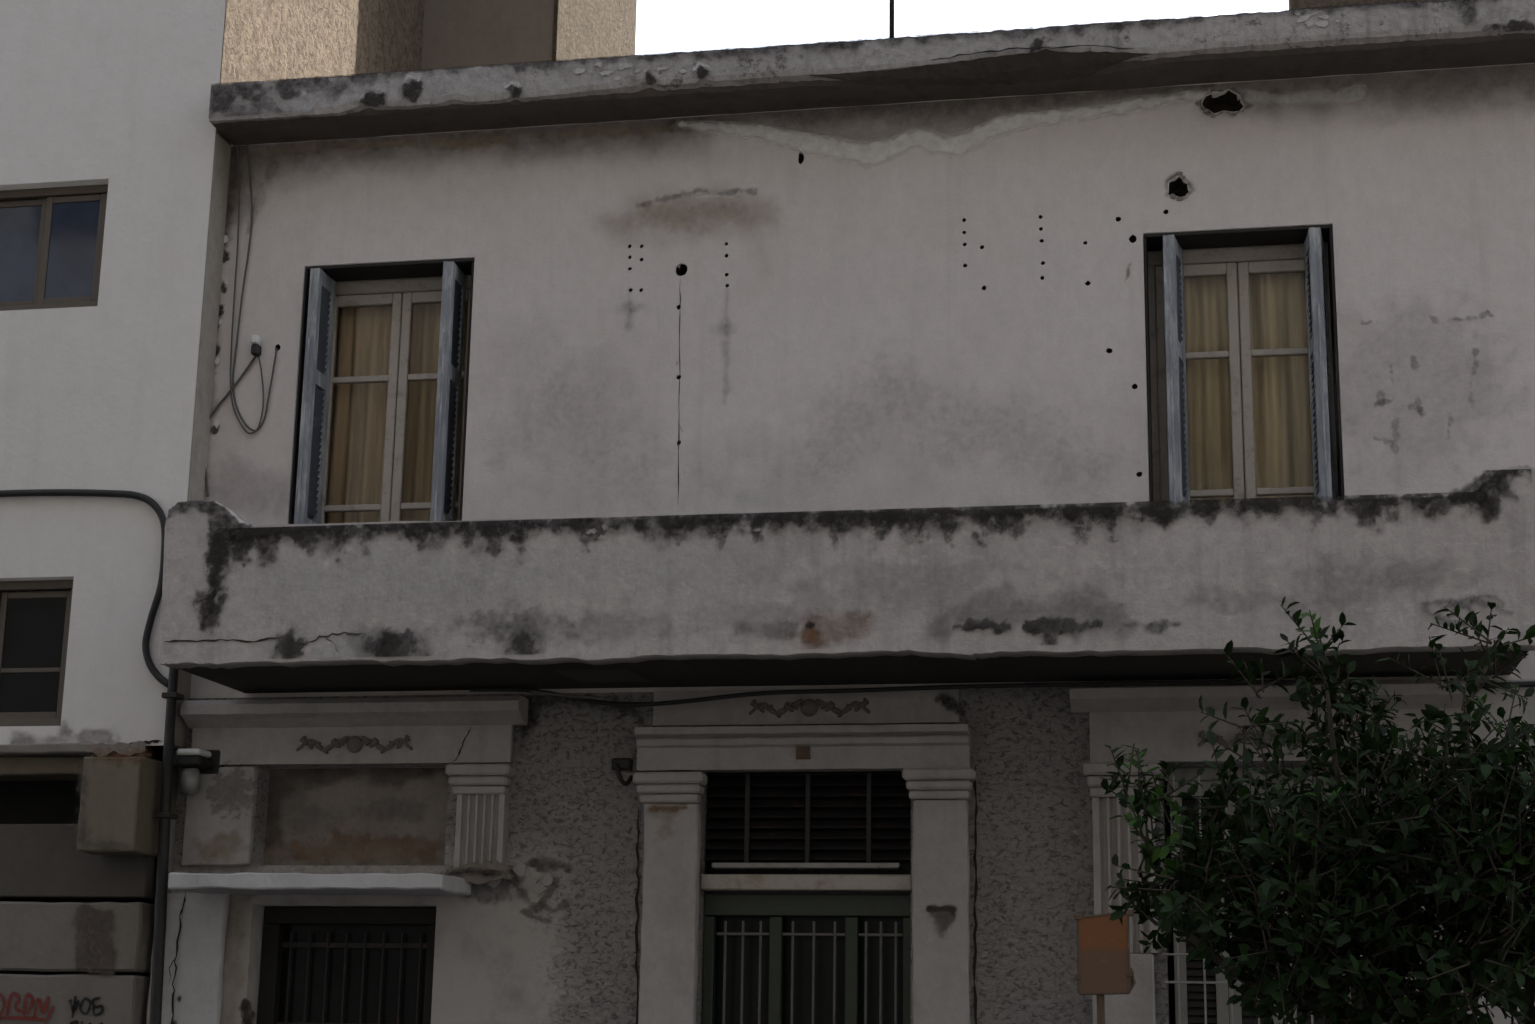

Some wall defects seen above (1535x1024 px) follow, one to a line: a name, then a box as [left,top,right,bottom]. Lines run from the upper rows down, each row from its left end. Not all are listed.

spalling [360,76,422,107]
spalling [504,82,522,98]
crack [675,295,683,494]
leakage [167,469,1532,630]
crack [165,632,364,659]
leakage [272,629,308,659]
leakage [358,628,427,657]
leakage [506,629,538,654]
corrosion [802,622,819,645]
spalling [446,860,569,916]
spalling [926,905,956,933]